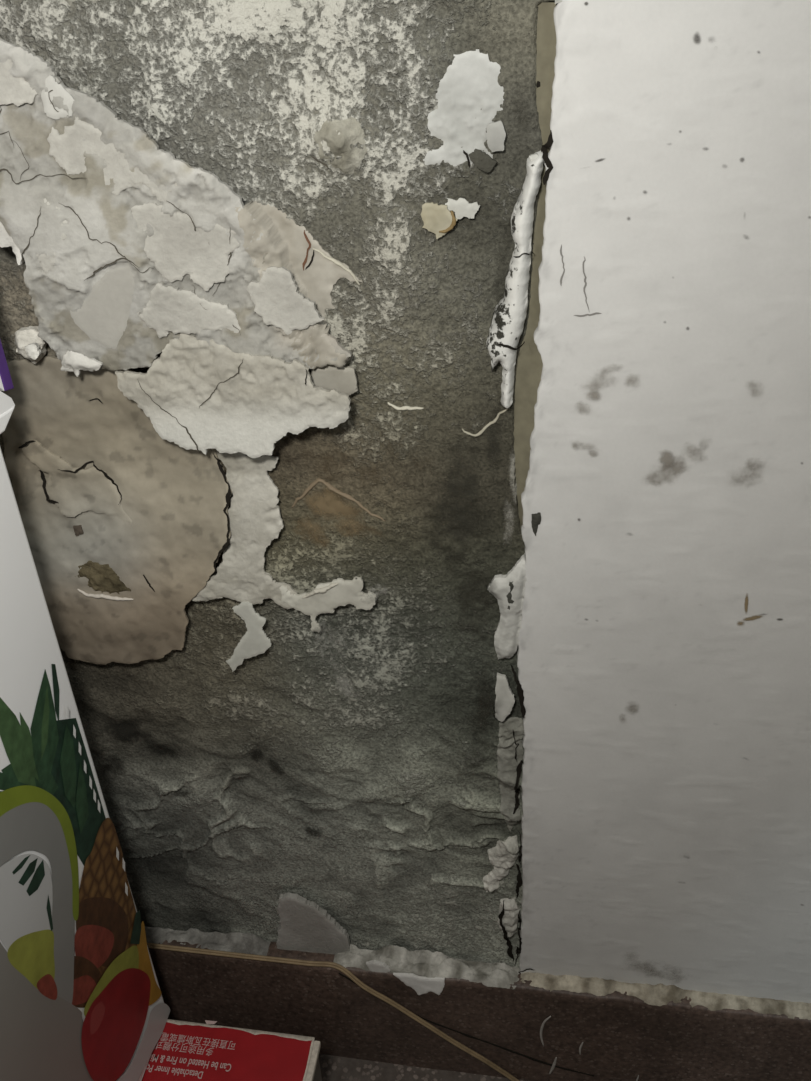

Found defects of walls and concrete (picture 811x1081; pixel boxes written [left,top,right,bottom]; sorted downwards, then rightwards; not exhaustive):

peeling [486,120,506,152]
peeling [421,198,480,239]
crack [498,0,602,526]
flaking render [0,38,376,672]
spalling [531,512,541,536]
spalling [482,553,533,973]
peeling [366,960,445,995]